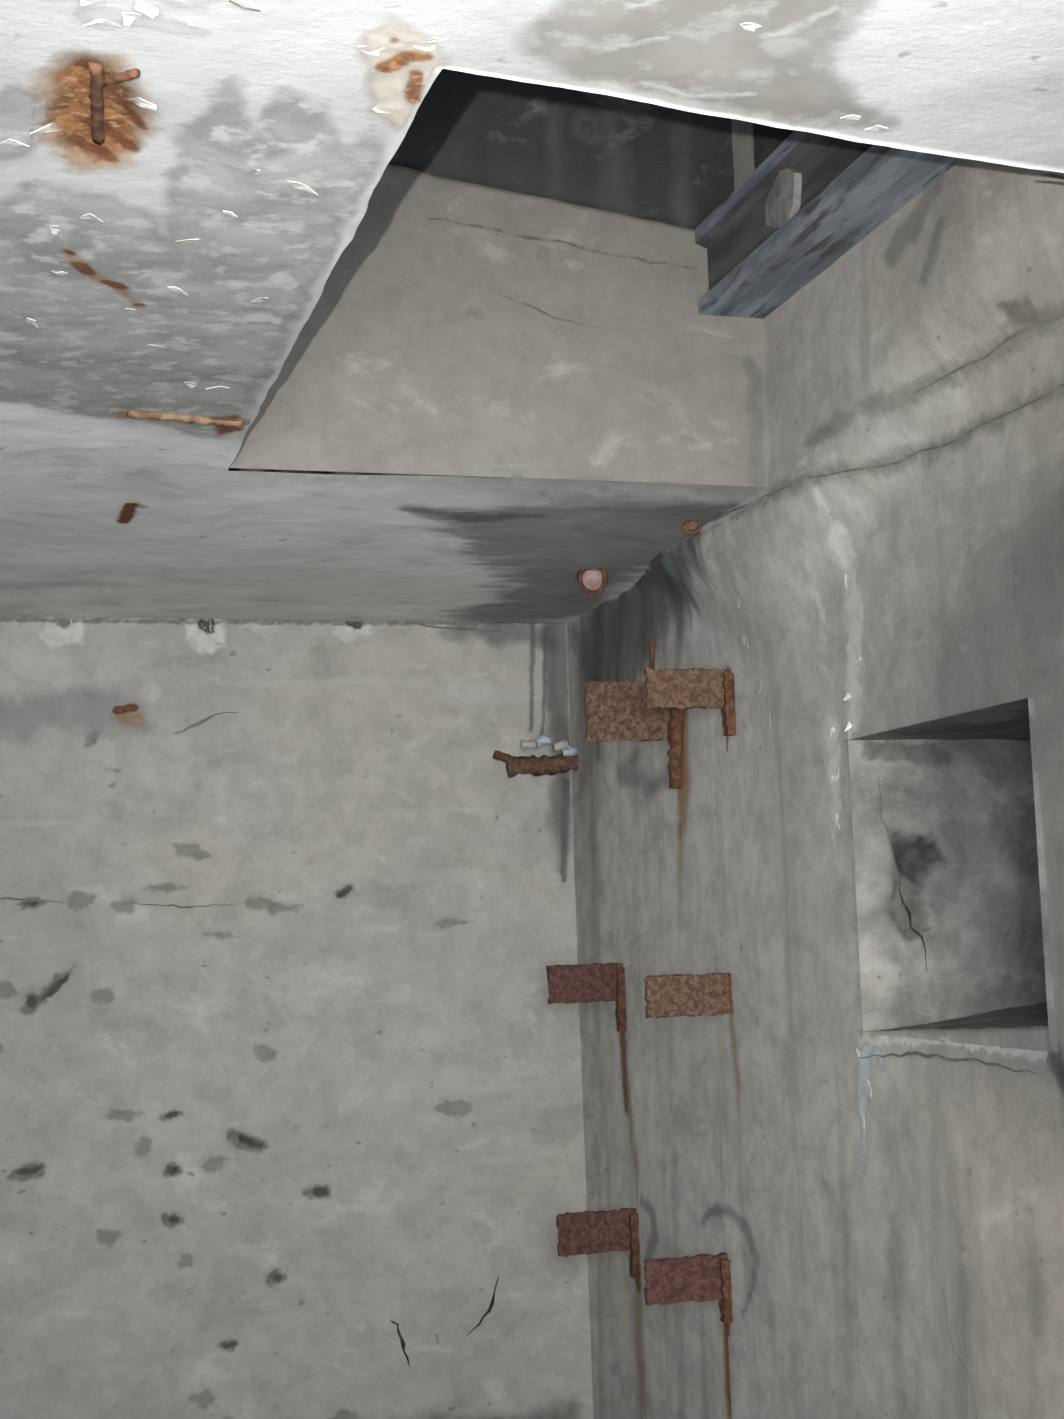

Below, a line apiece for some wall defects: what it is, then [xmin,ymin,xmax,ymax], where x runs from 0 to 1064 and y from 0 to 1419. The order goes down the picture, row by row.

rust [30,55,157,166]
spalling [357,22,444,129]
crack [1026,172,1064,180]
rust [64,251,145,306]
crack [821,302,1064,436]
crack [702,383,1064,526]
damp [403,508,518,521]
damp [530,623,569,755]
rust [678,709,688,816]
damp [554,771,570,881]